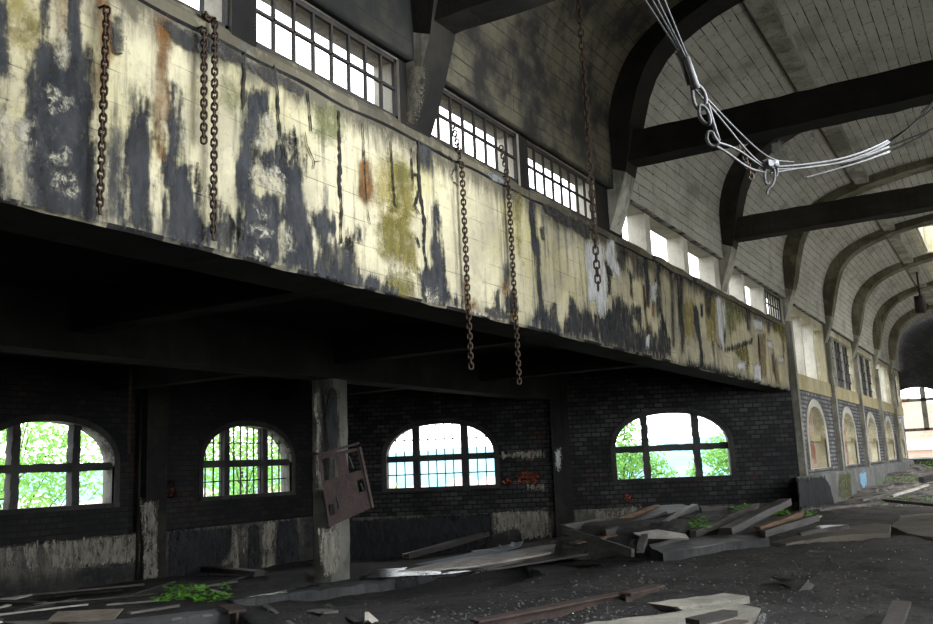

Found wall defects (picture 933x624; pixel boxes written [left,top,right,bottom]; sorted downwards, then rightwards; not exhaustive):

rust [155,21,170,157]
leakage [254,128,307,175]
rust [359,159,374,204]
leakage [378,163,410,224]
leakage [585,240,657,347]
leakage [670,276,726,355]
leakage [737,319,784,385]
peeling [314,393,323,491]
peeling [4,501,159,580]
peeling [261,520,276,568]
peeling [318,526,340,576]
peeling [493,510,552,541]